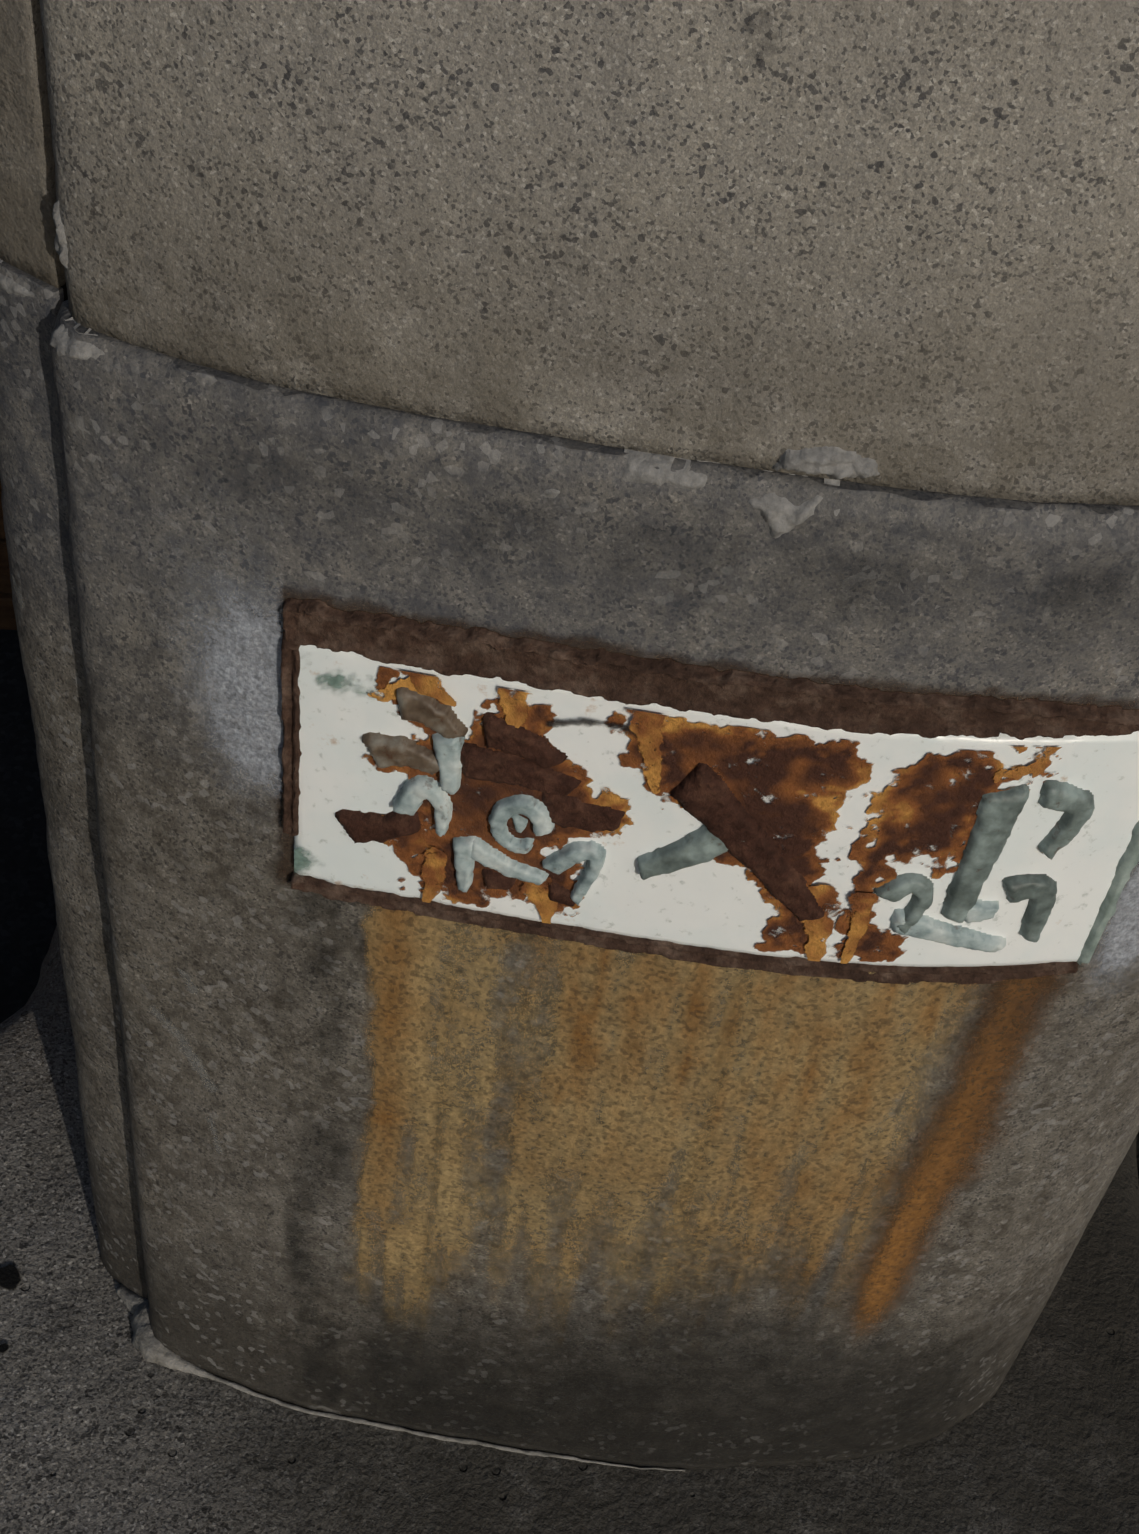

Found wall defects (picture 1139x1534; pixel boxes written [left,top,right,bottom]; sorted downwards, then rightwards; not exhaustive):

spalling [620,449,720,490]
spalling [748,446,881,539]
rust [367,667,456,753]
rust [356,688,1062,1324]